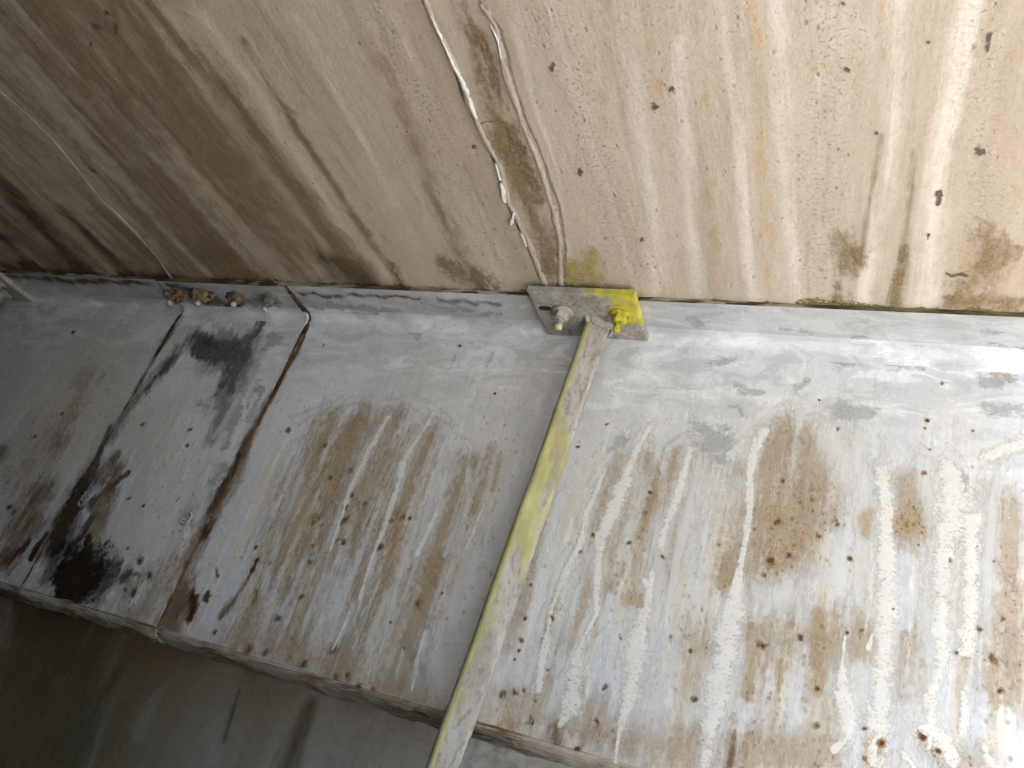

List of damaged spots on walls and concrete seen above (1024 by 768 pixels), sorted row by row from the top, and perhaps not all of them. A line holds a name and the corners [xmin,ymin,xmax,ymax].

crack [422,0,567,287]
leakage [764,234,907,308]
rust [0,368,102,574]
leakage [26,303,283,767]
rust [121,291,310,633]
rust [213,398,499,702]
leakage [524,418,653,729]
rust [500,667,802,768]
leakage [603,435,721,763]
leakage [696,396,809,768]
rust [718,415,840,594]
leakage [817,401,1024,768]